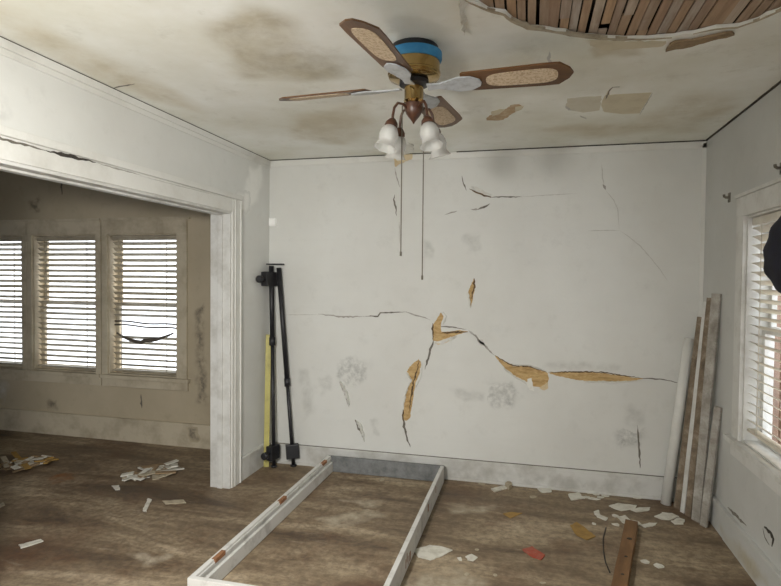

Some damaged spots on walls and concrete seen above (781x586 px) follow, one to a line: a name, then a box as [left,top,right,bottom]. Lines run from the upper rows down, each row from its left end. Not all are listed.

damp [183,0,366,87]
flaking render [459,0,781,52]
peeling [486,104,524,121]
peeling [565,87,653,119]
crack [0,137,218,196]
crack [445,178,565,215]
flaking render [467,279,476,308]
crack [290,311,427,319]
crack [469,331,494,355]
flaking render [402,312,468,445]